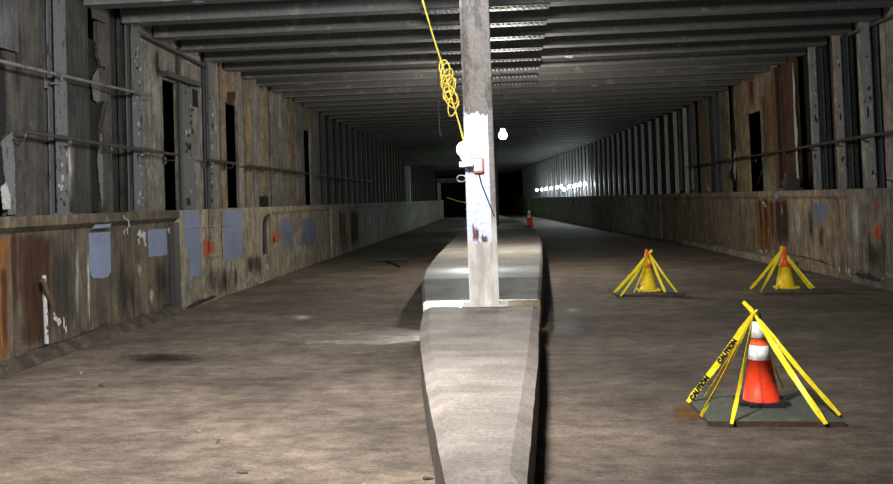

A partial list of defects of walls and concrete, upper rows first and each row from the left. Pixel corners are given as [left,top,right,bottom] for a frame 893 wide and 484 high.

peeling [1,132,16,215]
rust [757,199,788,248]